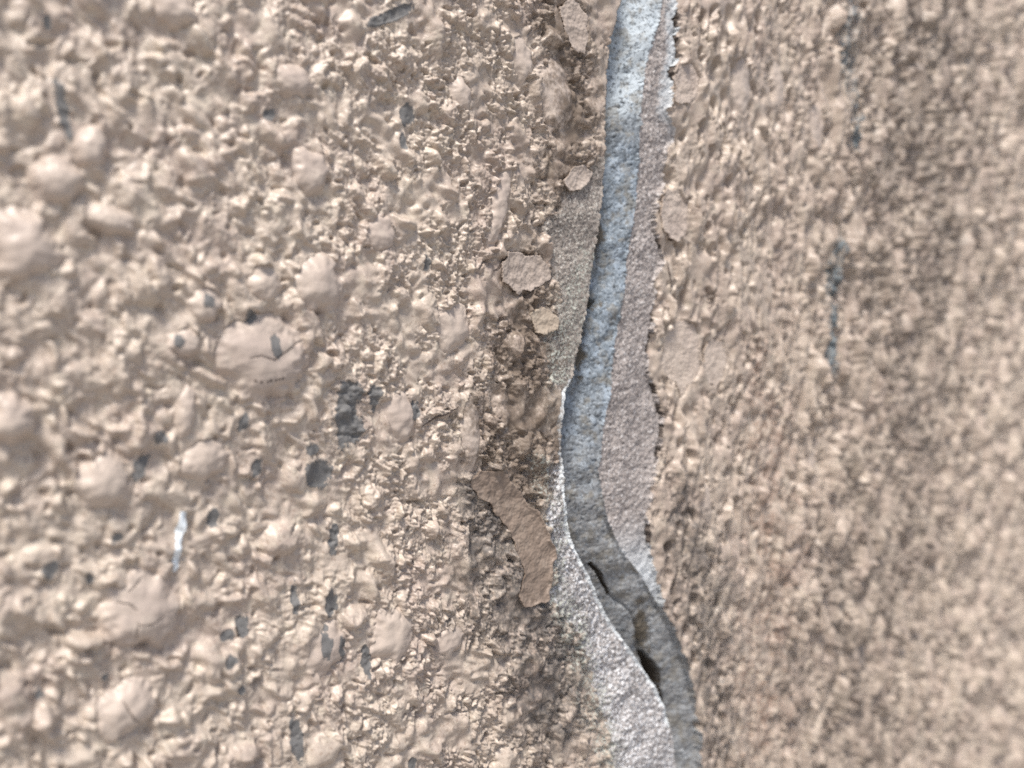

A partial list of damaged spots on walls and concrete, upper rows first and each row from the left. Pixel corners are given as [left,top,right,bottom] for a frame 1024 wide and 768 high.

peeling [559,0,589,55]
flaking render [501,151,606,390]
crack [556,0,703,768]
flaking render [598,0,727,607]
flaking render [470,463,676,768]